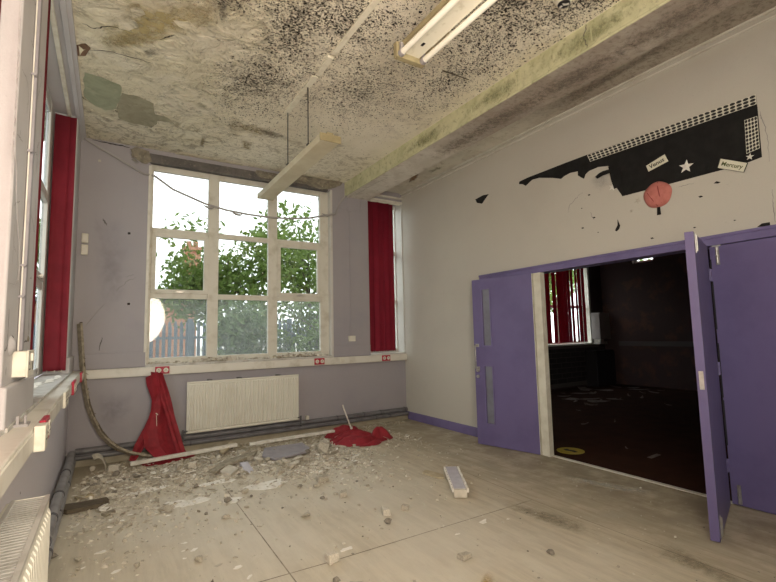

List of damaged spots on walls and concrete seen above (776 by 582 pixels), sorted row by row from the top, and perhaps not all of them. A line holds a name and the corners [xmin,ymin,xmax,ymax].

peeling [83,73,174,127]
water stain [194,0,619,148]